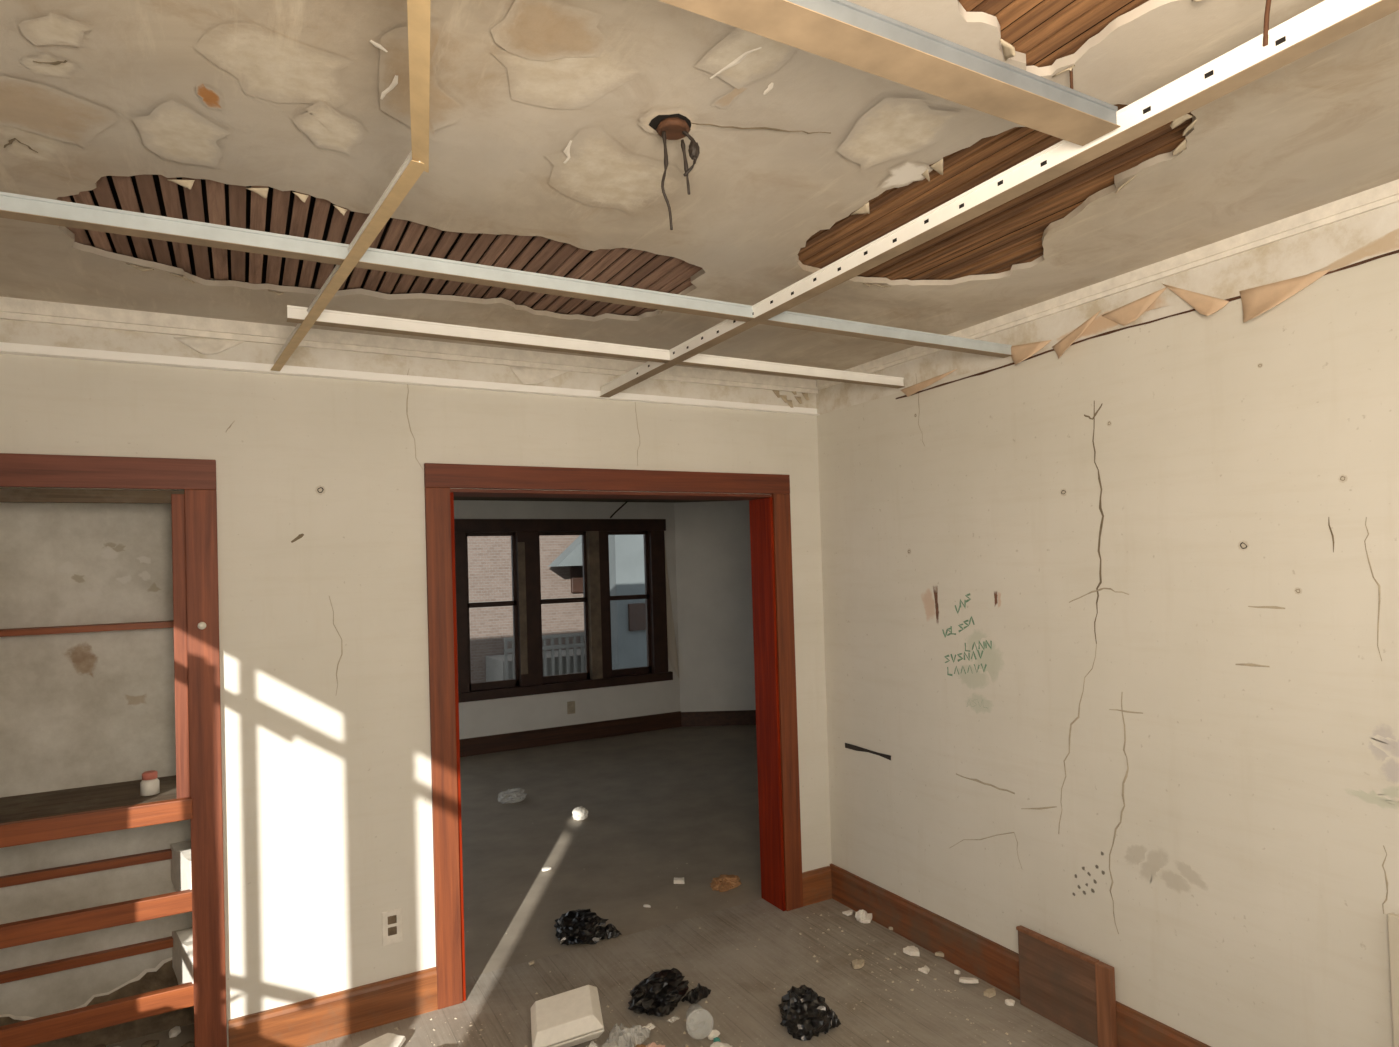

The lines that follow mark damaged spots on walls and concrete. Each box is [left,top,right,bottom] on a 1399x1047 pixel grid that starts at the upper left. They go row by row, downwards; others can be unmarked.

flaking render [958,0,1149,78]
flaking render [57,100,370,245]
flaking render [66,227,664,317]
flaking render [369,218,703,294]
flaking render [798,97,1063,269]
flaking render [858,112,1197,288]
crack [1058,401,1129,834]
crack [1328,517,1382,661]
crack [1109,692,1129,934]
flaking render [0,957,178,1026]
flaking render [28,1006,195,1047]